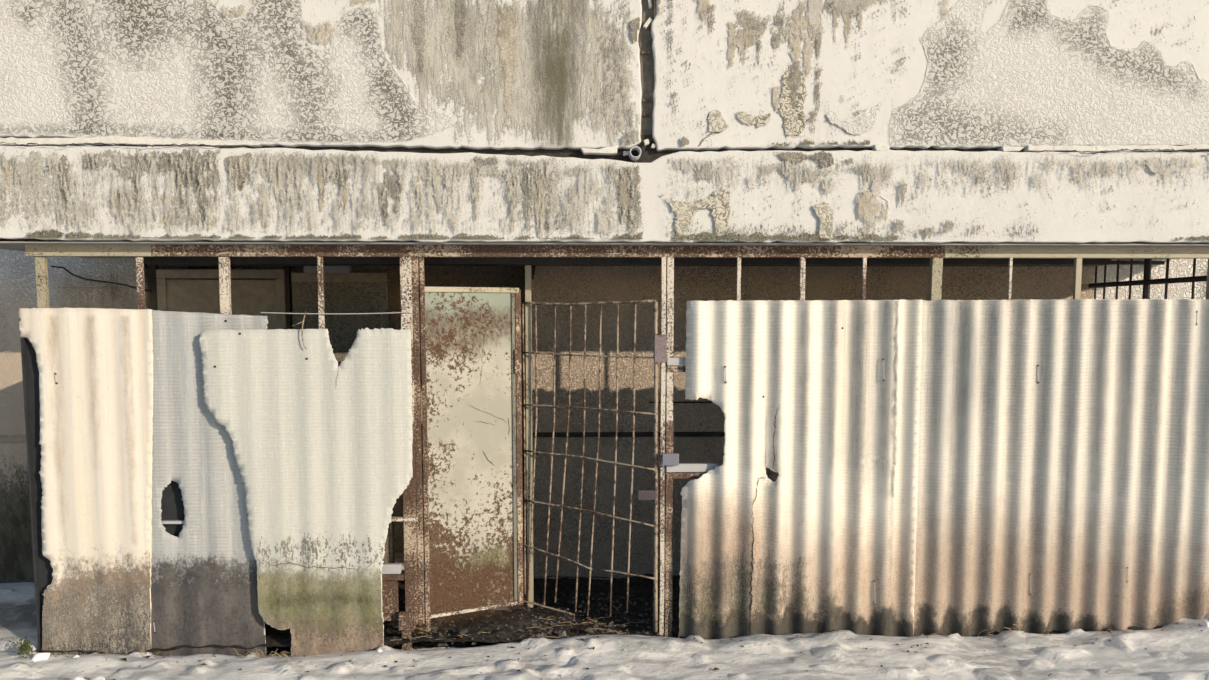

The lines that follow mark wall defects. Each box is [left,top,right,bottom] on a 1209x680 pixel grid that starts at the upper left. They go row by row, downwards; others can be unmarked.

leakage [58,0,98,132]
leakage [108,0,173,51]
leakage [195,1,246,137]
leakage [263,0,413,134]
leakage [403,0,467,74]
leakage [696,0,863,76]
leakage [174,152,328,232]
leakage [598,165,645,234]
corrosion [425,312,512,353]
leakage [0,306,384,656]
crack [749,405,780,634]
leakage [680,603,1114,639]